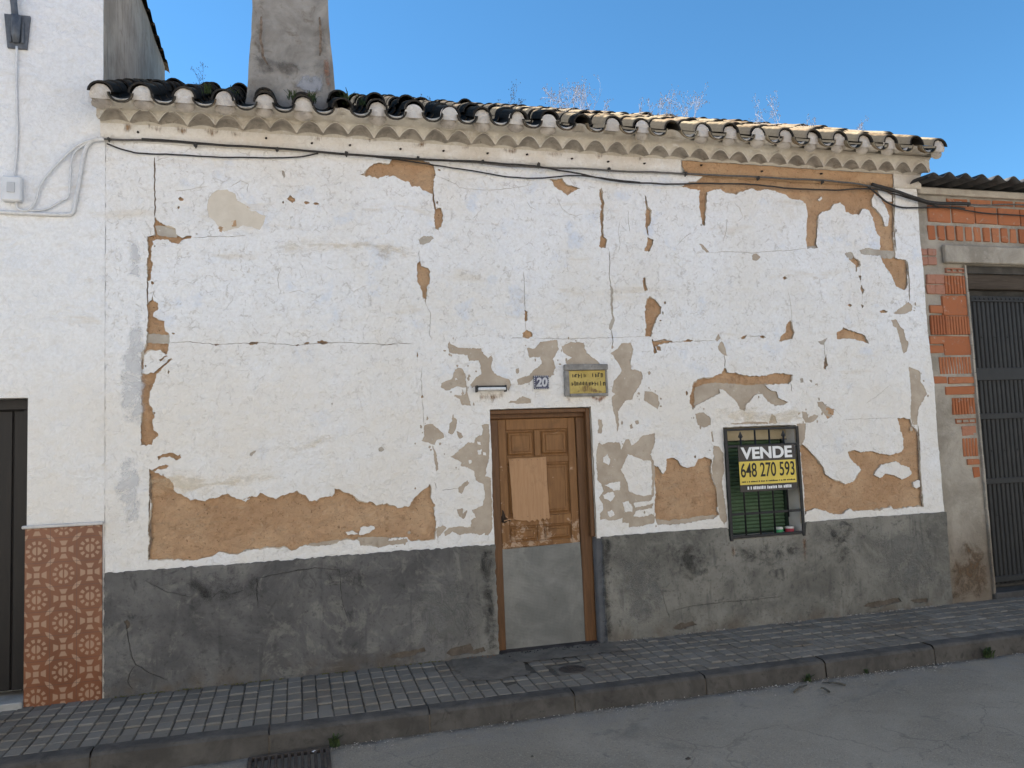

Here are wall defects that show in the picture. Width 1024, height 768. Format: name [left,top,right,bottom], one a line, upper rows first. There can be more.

flaking render [361,159,443,245]
flaking render [682,176,908,290]
flaking render [140,217,191,446]
crack [177,340,405,348]
peeling [441,311,599,406]
flaking render [148,416,493,561]
peeling [596,343,817,527]
flaking render [797,367,929,514]